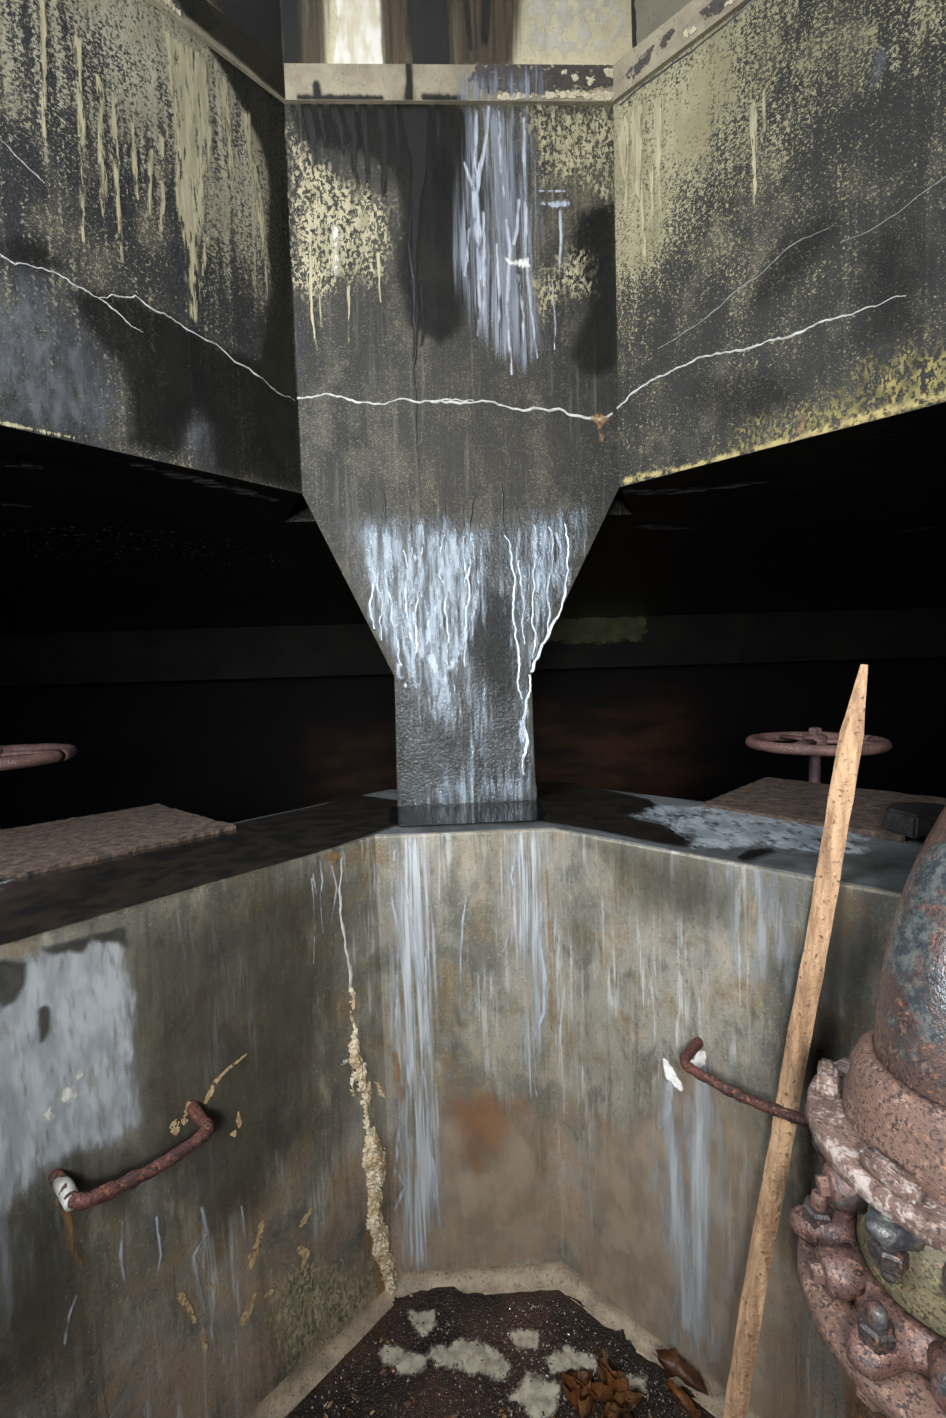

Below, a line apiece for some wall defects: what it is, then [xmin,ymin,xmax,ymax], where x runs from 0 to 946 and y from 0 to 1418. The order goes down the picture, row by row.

crack [0,139,45,184]
leakage [39,0,47,139]
leakage [74,0,664,501]
crack [0,176,946,421]
leakage [749,91,766,204]
leakage [624,389,946,495]
leakage [367,482,824,1085]
leakage [0,794,398,1302]
crack [338,857,397,1295]
leakage [391,837,545,1268]
leakage [585,1050,759,1382]
leakage [805,928,859,1083]